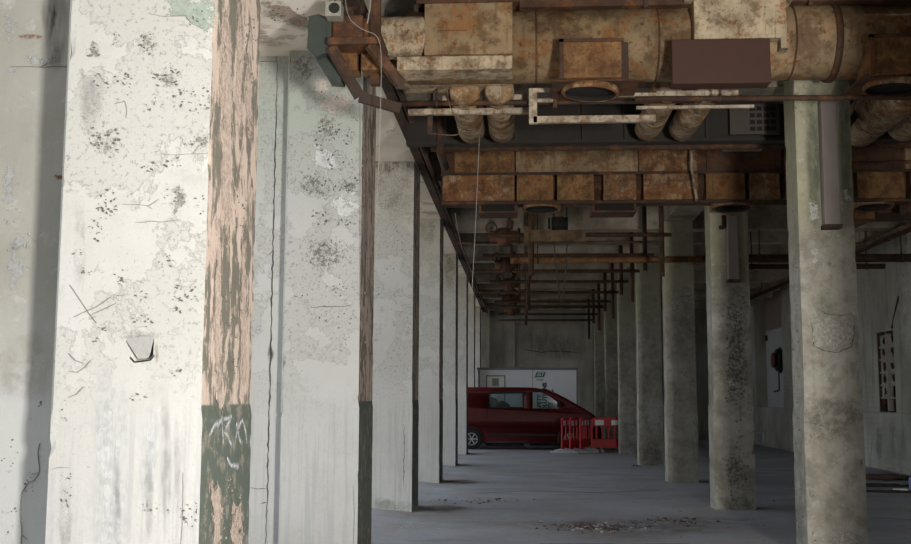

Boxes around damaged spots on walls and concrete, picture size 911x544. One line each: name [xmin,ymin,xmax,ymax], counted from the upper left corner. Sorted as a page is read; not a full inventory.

peeling [89,126,120,158]
spalling [93,314,154,363]
crack [20,443,68,544]